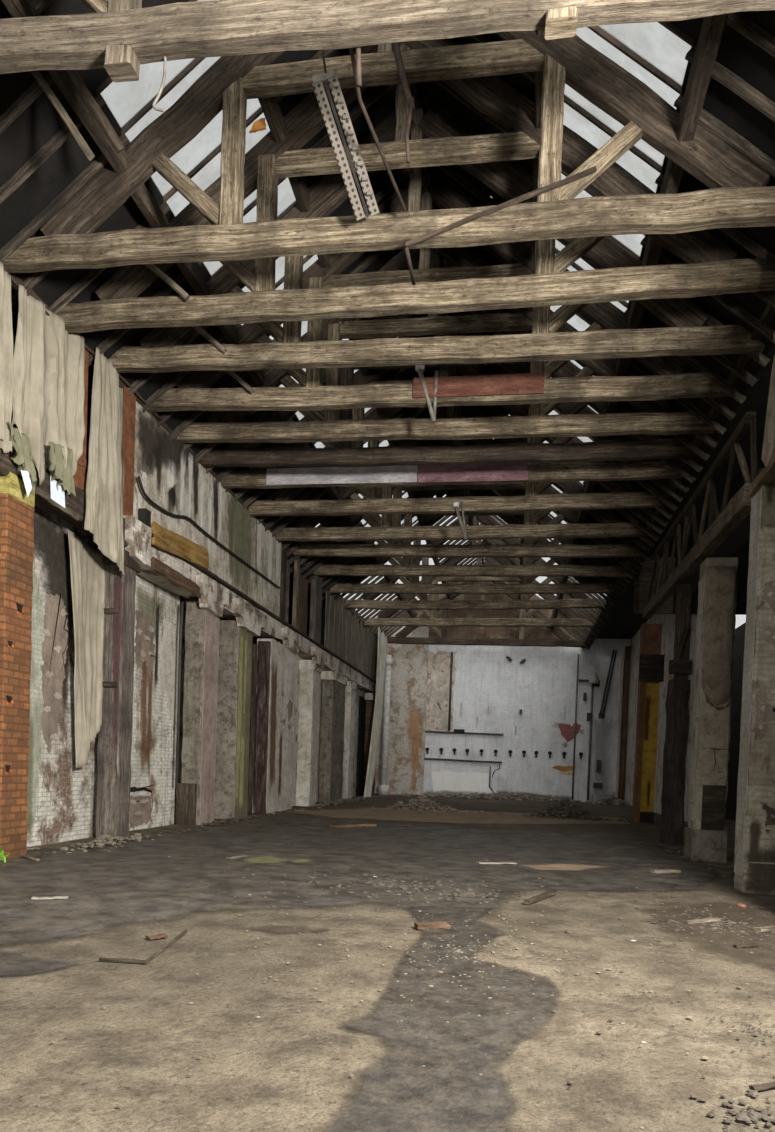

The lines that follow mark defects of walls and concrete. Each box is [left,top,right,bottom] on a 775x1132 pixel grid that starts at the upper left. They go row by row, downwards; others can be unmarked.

leakage [138,411,233,570]
leakage [256,519,281,594]
rust [141,607,159,768]
rust [409,710,420,788]
peeling [552,722,585,747]
spalling [760,792,775,833]